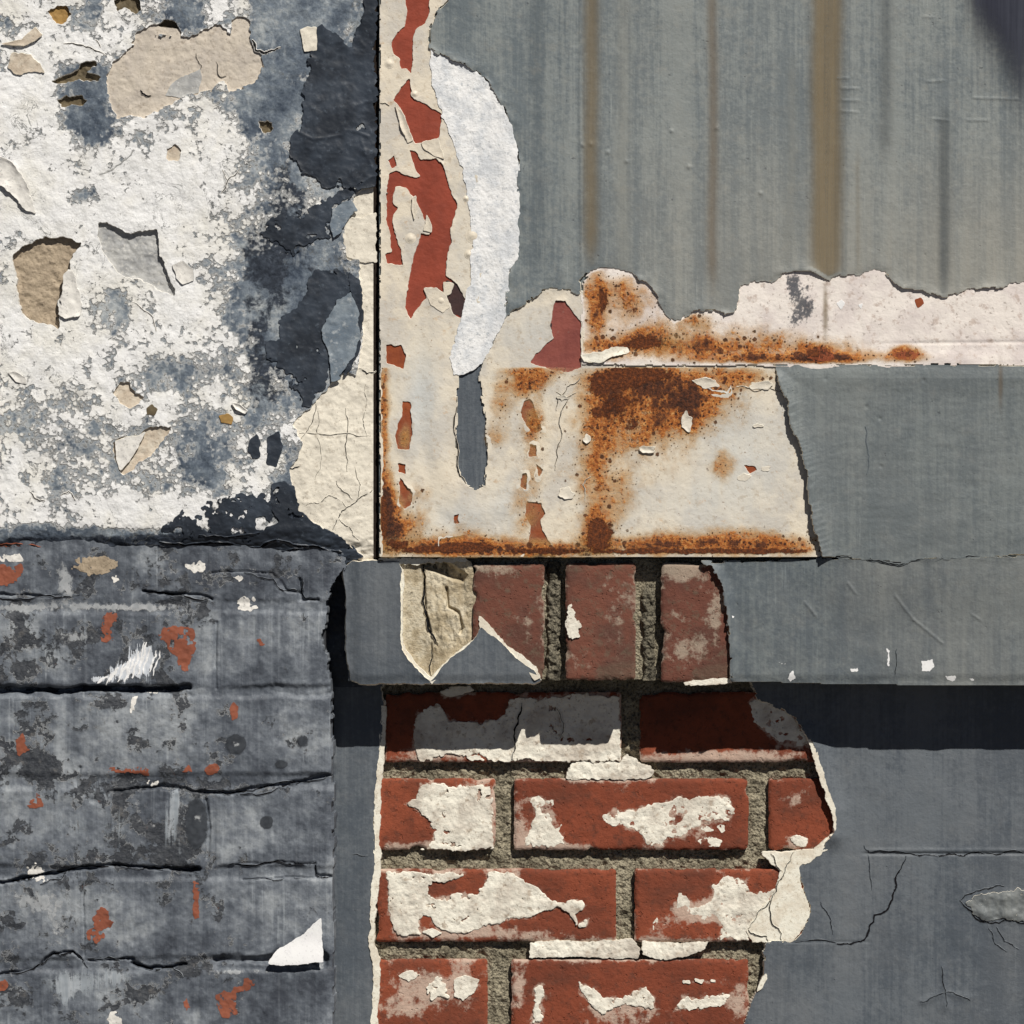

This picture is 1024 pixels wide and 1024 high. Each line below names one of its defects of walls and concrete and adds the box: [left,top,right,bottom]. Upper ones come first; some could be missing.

rust [381,272,928,558]